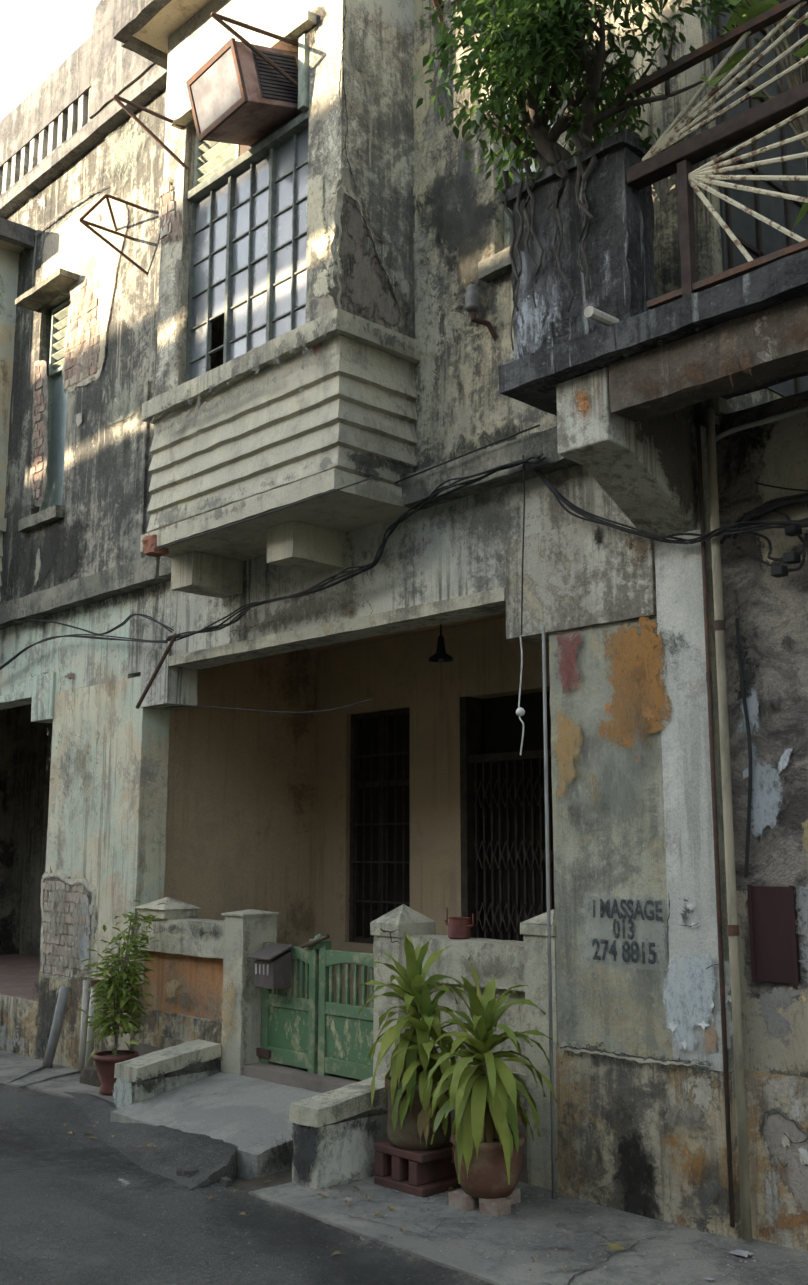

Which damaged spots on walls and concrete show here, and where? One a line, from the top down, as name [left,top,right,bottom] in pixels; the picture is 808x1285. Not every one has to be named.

crack [338,4,406,336]
spalling [304,34,460,459]
peeling [29,183,128,507]
damp [47,721,103,813]
peeling [555,616,674,810]
peeling [736,685,793,839]
peeling [800,819,808,853]
flaking render [39,867,98,982]
spalling [757,986,808,1049]
damp [556,1097,662,1221]
spalling [759,1108,808,1216]
crack [544,1230,656,1285]